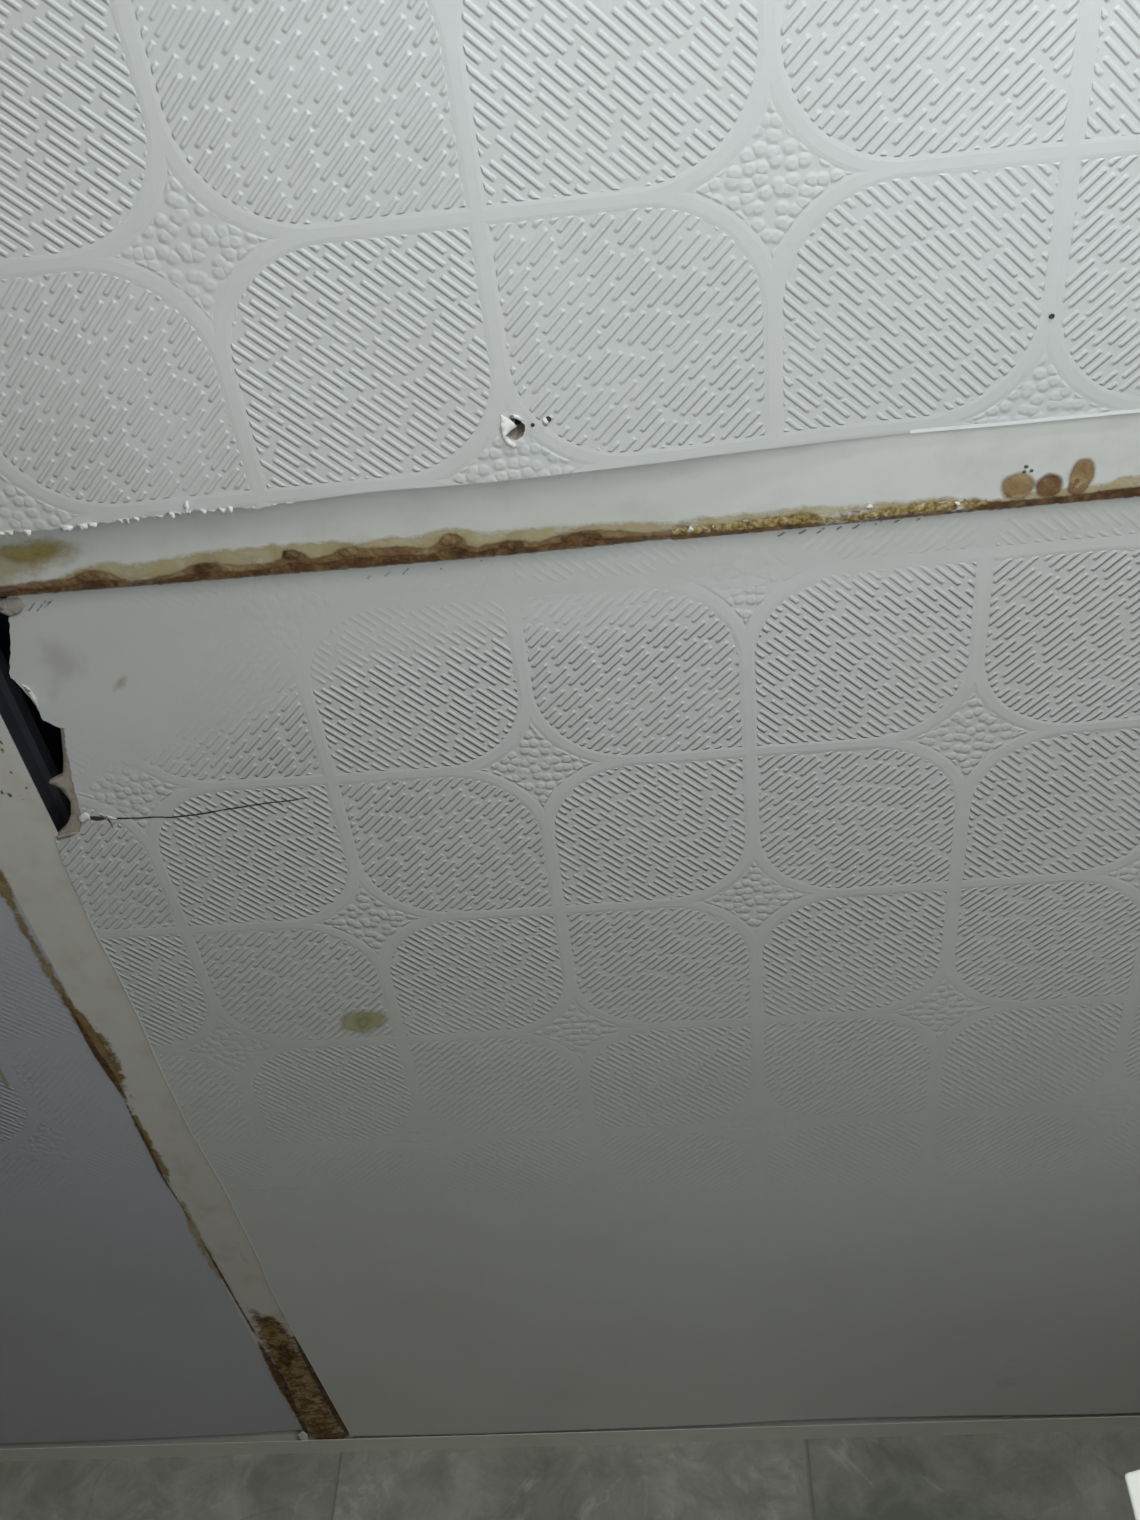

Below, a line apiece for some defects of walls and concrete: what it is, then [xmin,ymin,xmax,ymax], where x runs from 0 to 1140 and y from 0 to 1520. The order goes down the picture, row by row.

corrosion [0,459,1140,597]
spalling [0,598,51,617]
spalling [22,684,39,708]
spalling [49,728,90,839]
crack [90,797,307,828]
damp [344,1013,384,1032]
corrosion [0,872,349,1440]